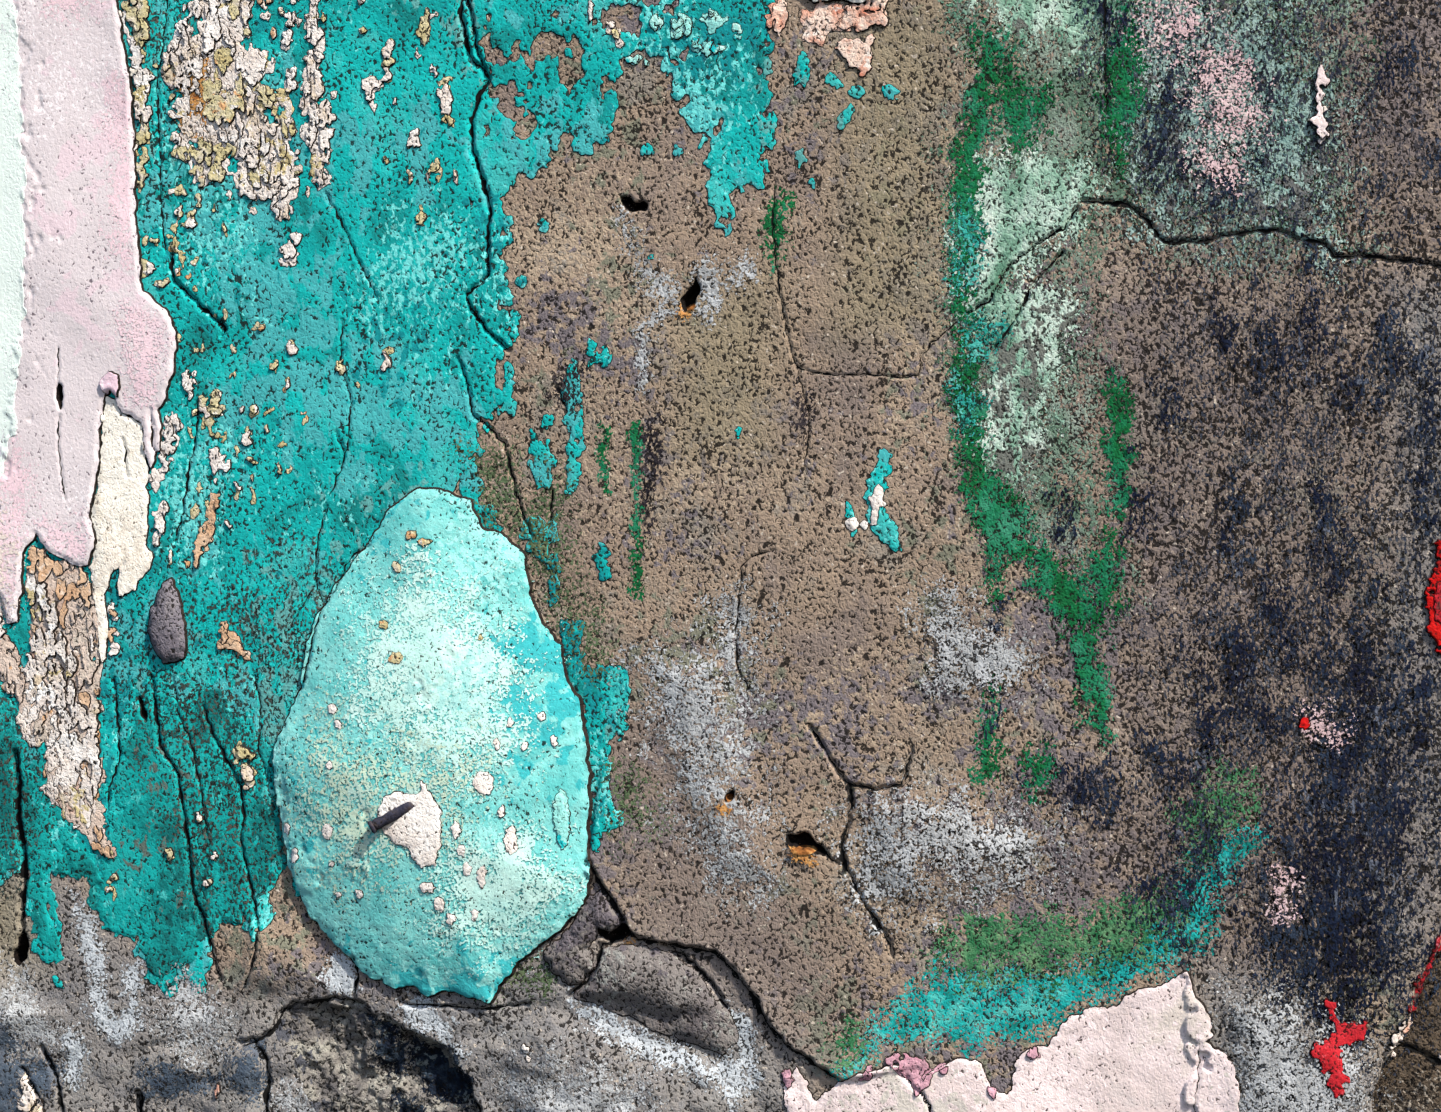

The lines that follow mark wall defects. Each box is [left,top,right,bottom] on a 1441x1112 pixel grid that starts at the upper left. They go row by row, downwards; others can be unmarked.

crack [457,0,506,348]
peeling [1308,64,1331,146]
crack [771,181,1441,475]
peeling [0,0,903,998]
crack [459,360,554,536]
peeling [1424,539,1441,655]
peeling [1298,716,1311,731]
crack [812,729,912,951]
crack [240,958,362,1112]
crack [569,863,835,1078]
peeling [1309,998,1368,1099]
peeling [1373,935,1441,1112]